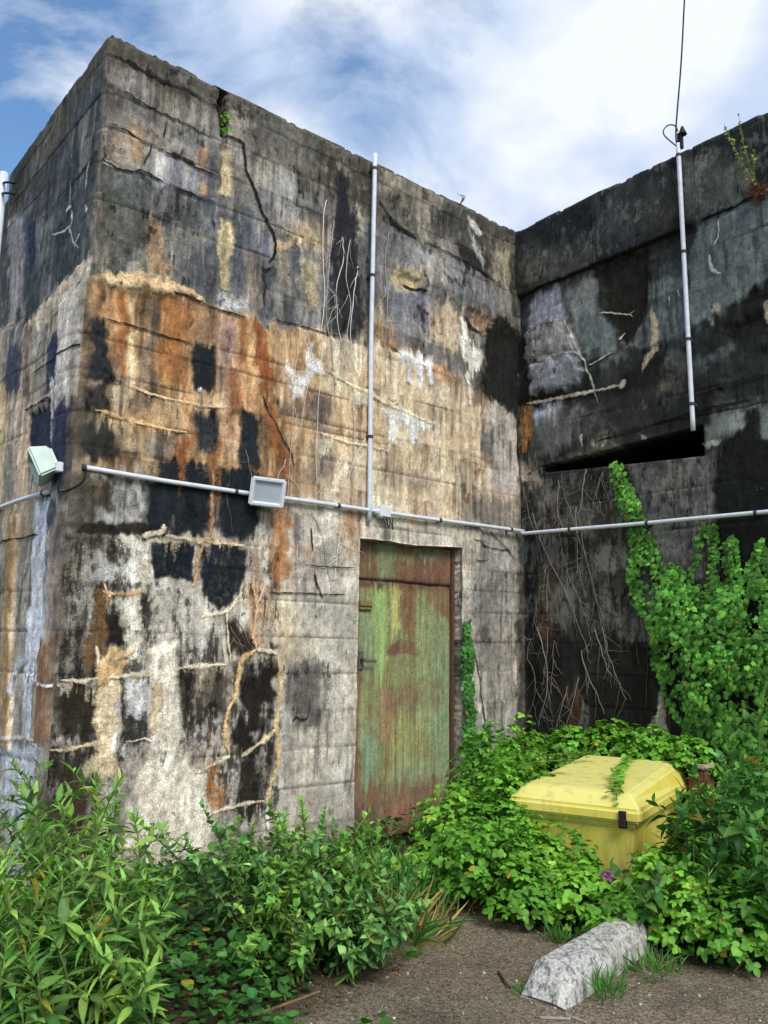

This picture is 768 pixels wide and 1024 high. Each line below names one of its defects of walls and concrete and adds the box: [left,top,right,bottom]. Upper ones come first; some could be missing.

damp [28,221,36,273]
corrosion [115,294,131,373]
crack [40,53,343,337]
corrosion [228,317,292,496]
damp [329,167,364,337]
damp [2,281,114,857]
crack [0,735,152,752]
damp [51,410,277,852]
crack [31,527,355,830]
corrosion [253,509,294,589]